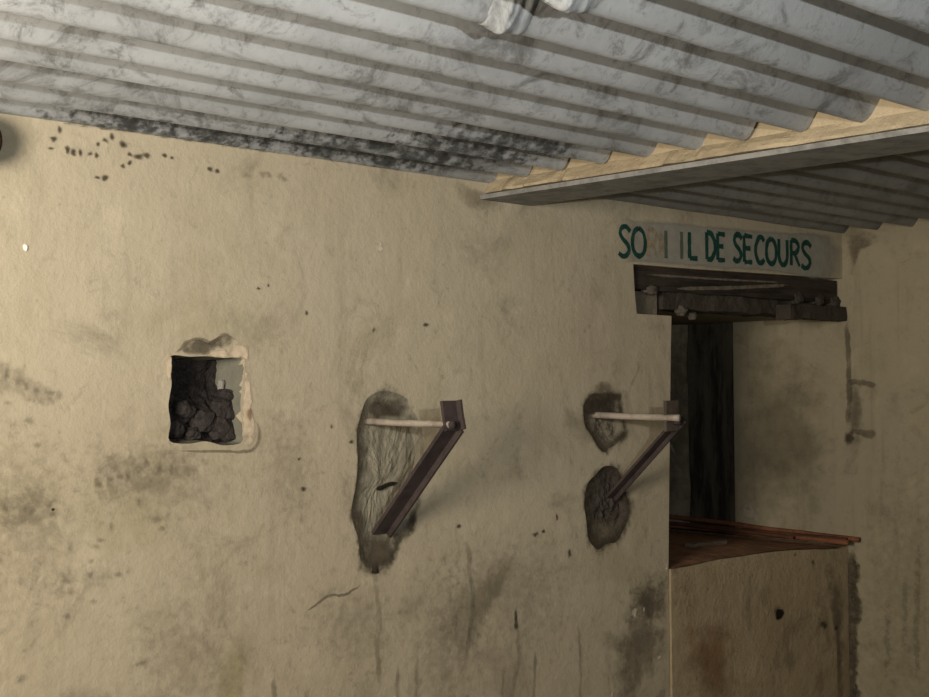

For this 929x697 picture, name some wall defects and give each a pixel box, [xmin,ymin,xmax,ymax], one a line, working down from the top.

leakage [66,111,570,171]
spalling [210,344,255,445]
spalling [583,386,627,452]
spalling [349,391,425,571]
spalling [584,466,631,549]